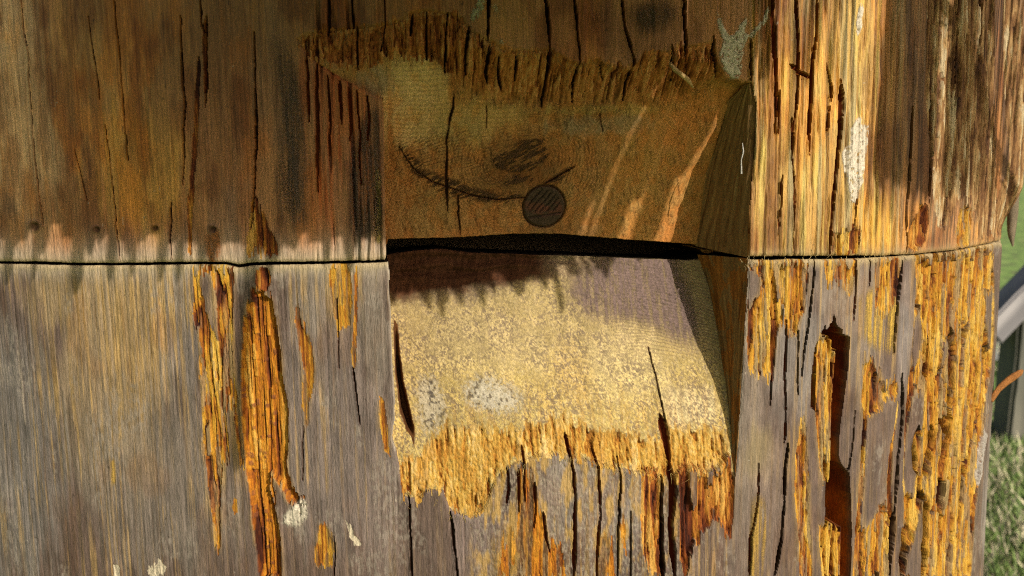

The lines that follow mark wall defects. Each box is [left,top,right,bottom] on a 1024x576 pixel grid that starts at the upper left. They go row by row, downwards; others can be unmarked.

crack [20,0,44,227]
crack [74,0,129,261]
crack [168,0,209,260]
crack [748,0,834,576]
crack [853,259,871,321]
crack [406,495,414,576]
crack [450,511,459,576]
crack [506,431,632,576]
crack [647,346,677,576]
spalling [821,314,852,576]
crack [846,410,856,470]